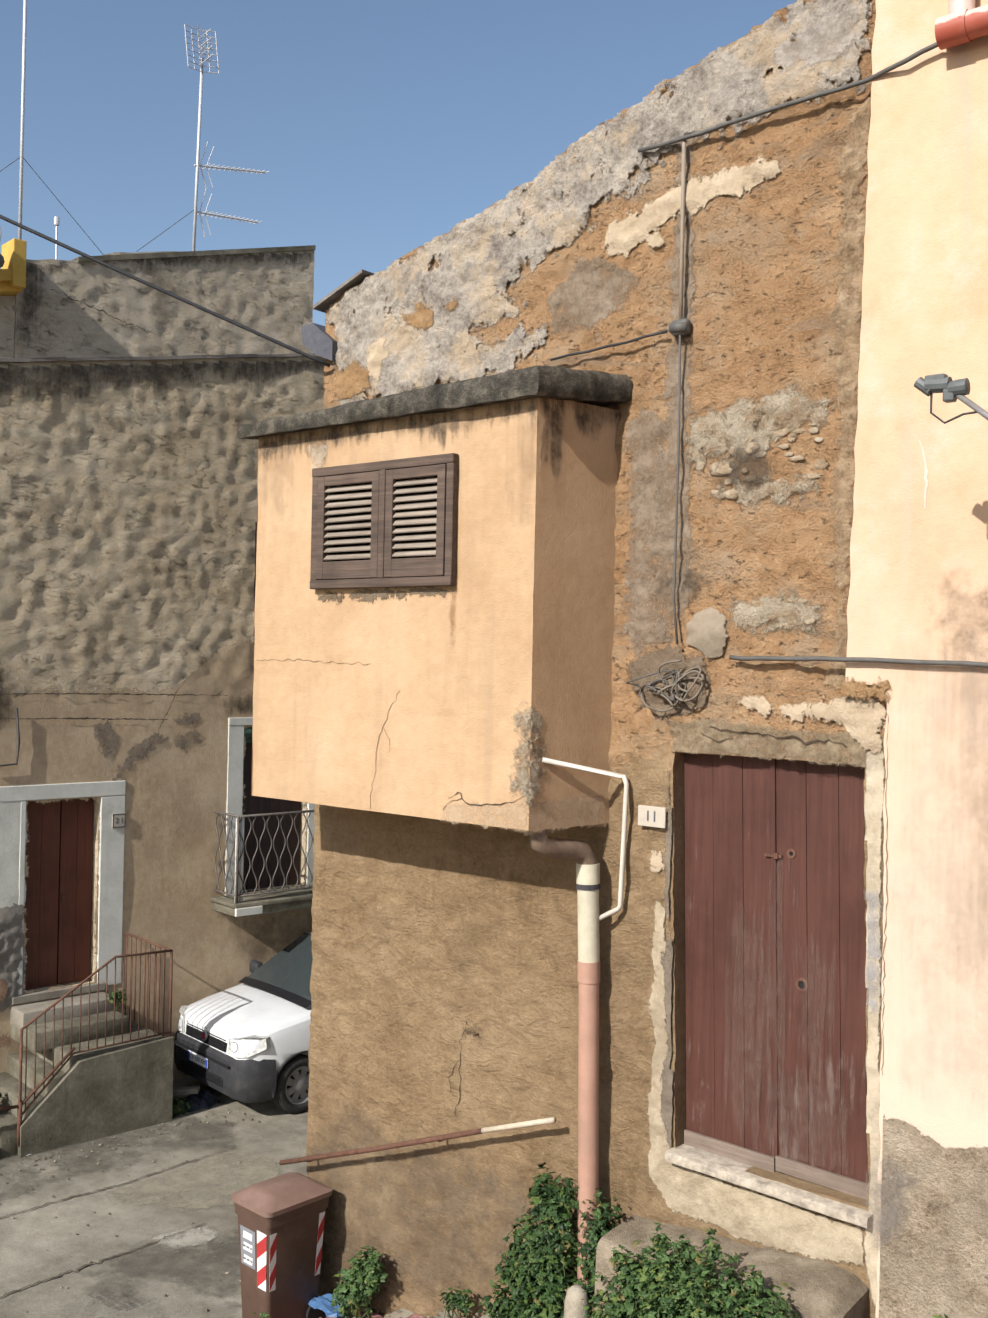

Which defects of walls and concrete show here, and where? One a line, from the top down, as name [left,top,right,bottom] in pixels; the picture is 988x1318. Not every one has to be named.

flaking render [326,0,873,405]
water stain [0,360,325,398]
water stain [261,414,458,468]
spalling [685,384,835,508]
crack [260,657,371,665]
crack [370,691,400,809]
flaking render [737,676,891,754]
crack [443,792,523,810]
flaking render [649,848,665,874]
flaking render [0,903,27,1013]
crack [448,1021,467,1116]
flaking render [646,901,988,1318]